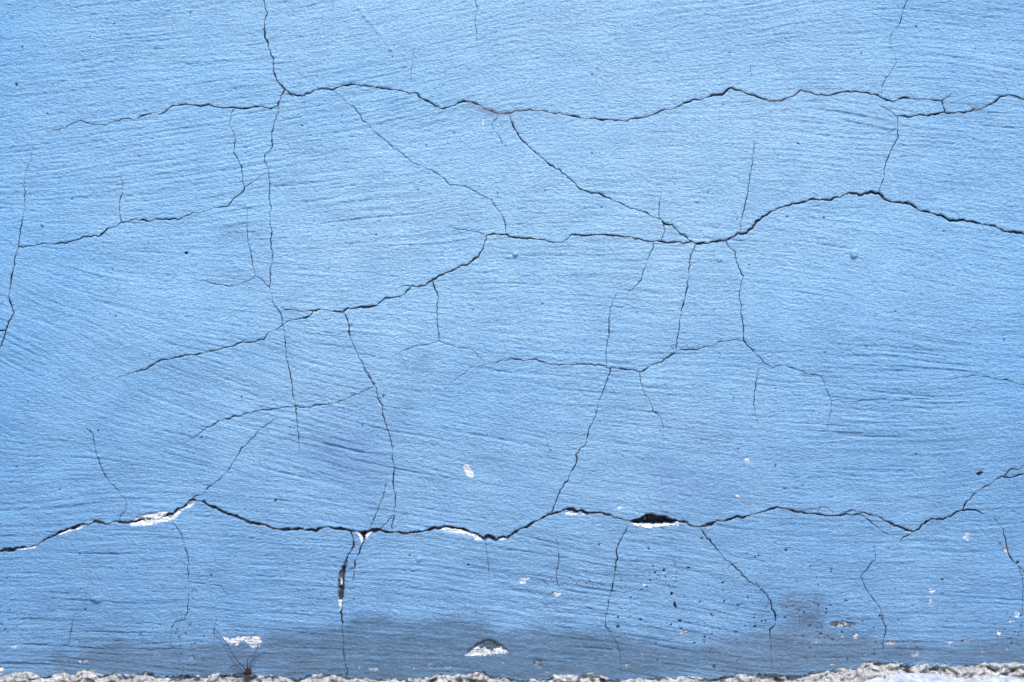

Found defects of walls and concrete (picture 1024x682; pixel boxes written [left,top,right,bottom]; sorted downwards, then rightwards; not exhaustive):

crack [0,0,1024,426]
crack [160,101,1024,679]
crack [0,428,151,552]
spalling [130,502,195,526]
spalling [632,514,679,528]
spalling [338,560,347,610]
spalling [465,639,508,664]